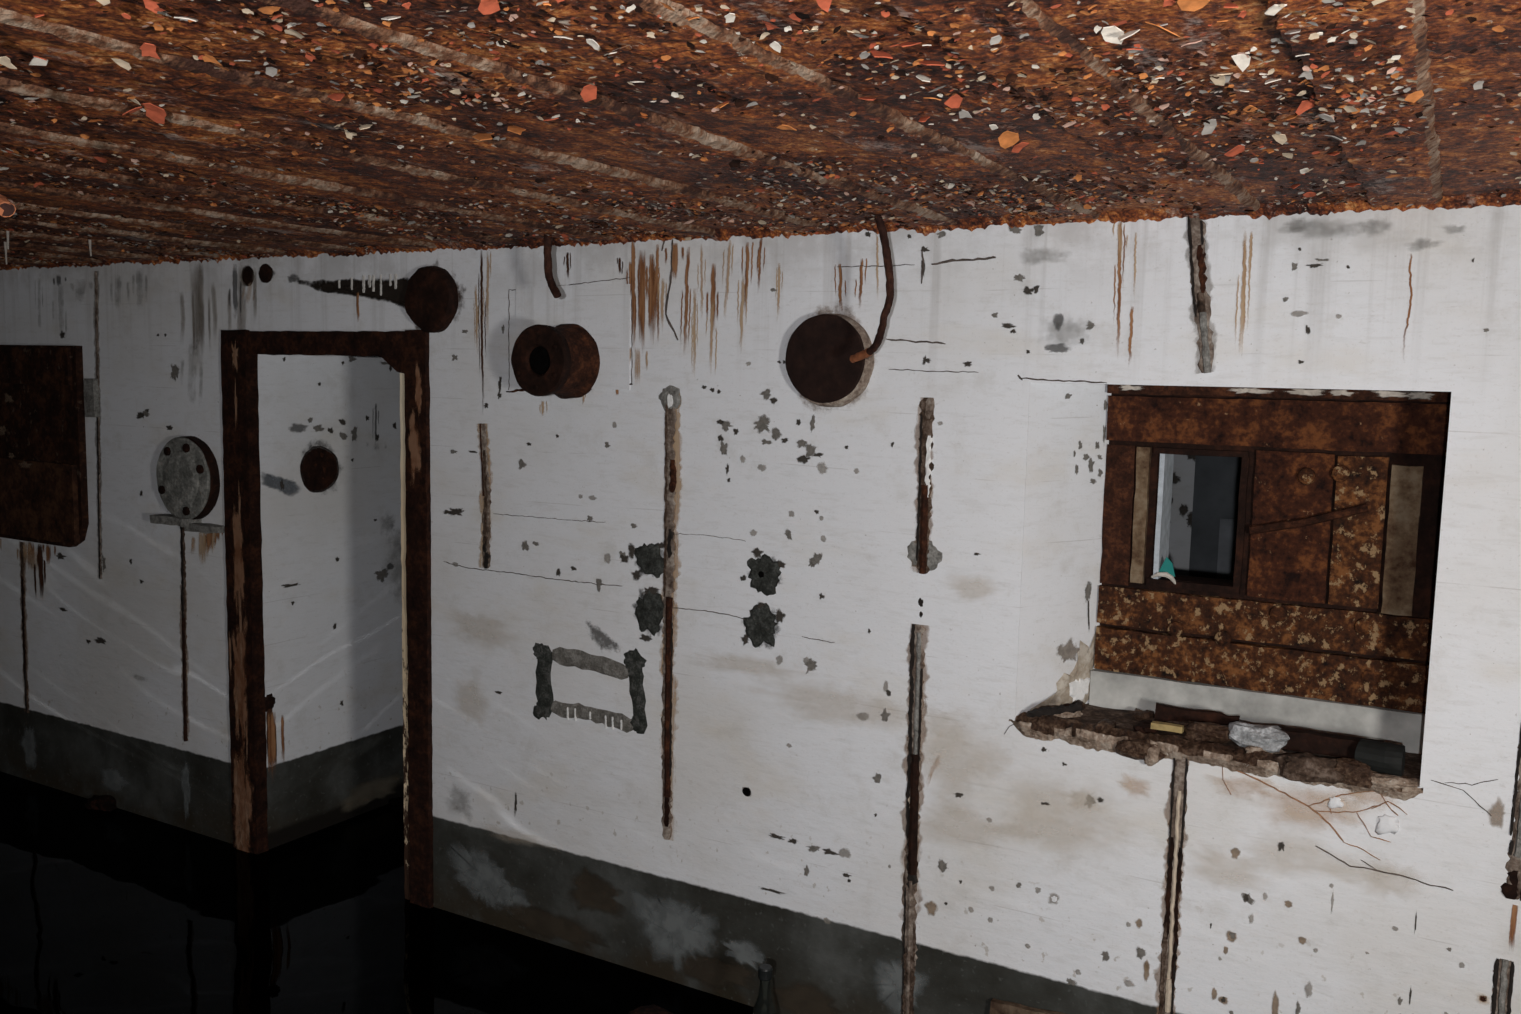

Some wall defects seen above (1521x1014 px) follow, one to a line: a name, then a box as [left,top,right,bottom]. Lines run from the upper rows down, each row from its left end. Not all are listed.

corrosion [617,238,783,374]
corrosion [834,237,879,306]
corrosion [1113,223,1137,356]
spalling [1188,216,1214,373]
corrosion [1235,234,1253,328]
corrosion [1404,256,1413,338]
spalling [596,385,681,840]
spalling [857,598,929,1014]
spalling [1155,758,1189,1014]
crack [1222,766,1453,891]
crack [1431,779,1498,816]
spalling [1491,727,1521,1014]